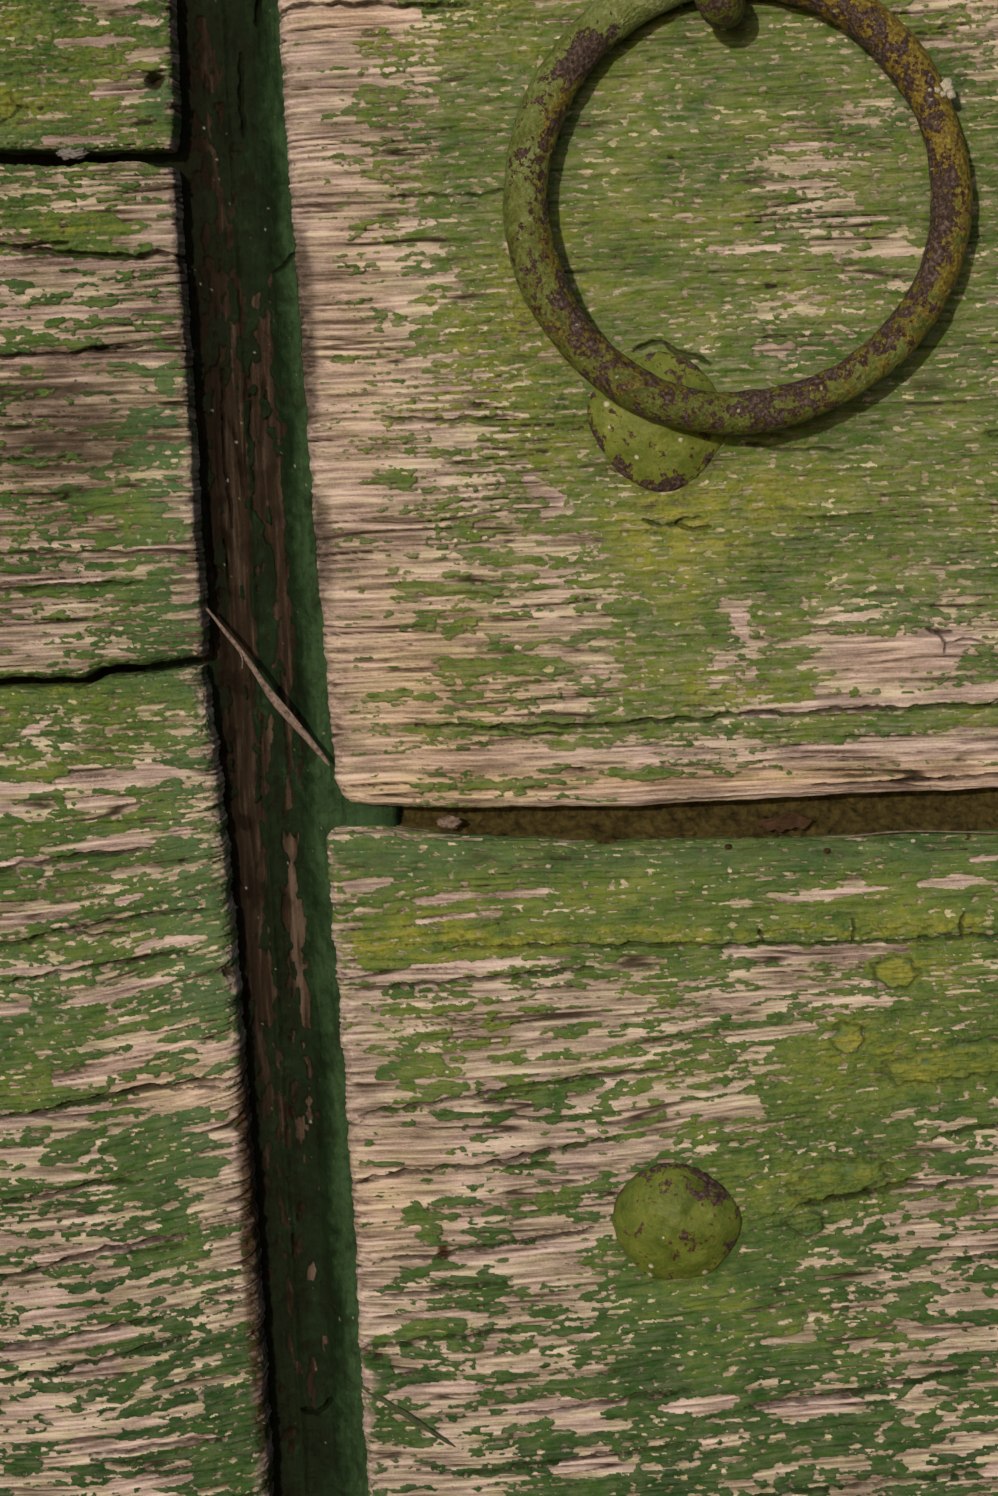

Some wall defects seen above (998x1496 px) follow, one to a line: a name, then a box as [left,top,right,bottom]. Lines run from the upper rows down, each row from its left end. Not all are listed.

peeling [39,161,177,221]
peeling [66,0,172,130]
peeling [0,256,186,654]
peeling [199,313,286,612]
peeling [289,0,998,804]
peeling [331,870,591,931]
peeling [743,846,998,913]
peeling [0,653,313,1496]
peeling [340,945,998,1496]